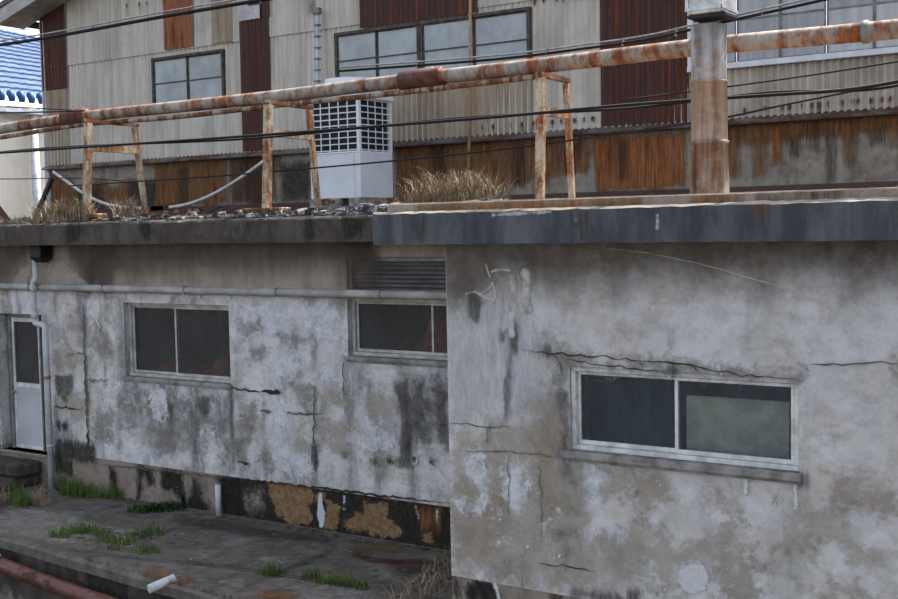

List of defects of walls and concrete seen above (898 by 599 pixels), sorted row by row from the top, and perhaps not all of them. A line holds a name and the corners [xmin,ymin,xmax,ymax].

rust [728,101,898,179]
damp [54,375,80,410]
damp [54,421,96,476]
crack [68,304,450,504]
damp [126,387,451,551]
peeling [234,296,402,539]
damp [395,292,578,493]
crack [451,423,593,572]
crack [527,350,792,379]
crack [813,354,898,377]
damp [452,576,497,599]
damp [550,588,640,599]